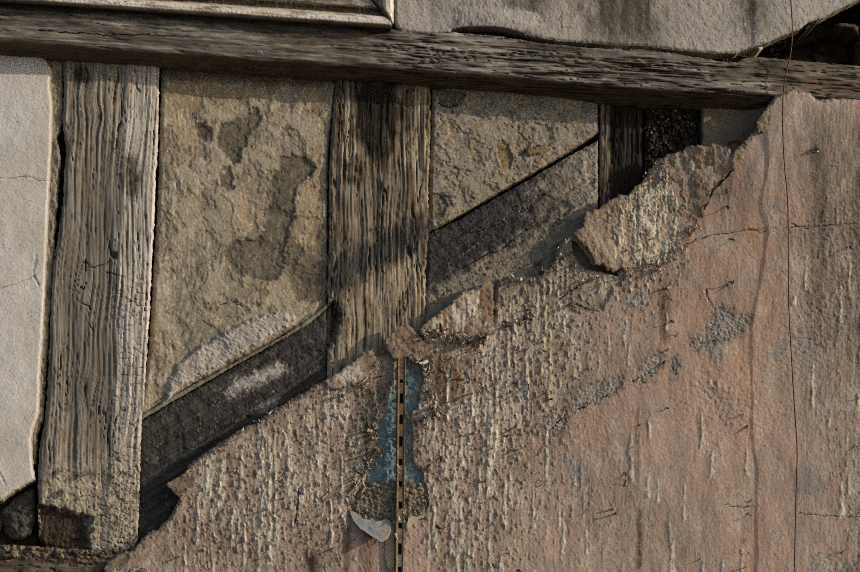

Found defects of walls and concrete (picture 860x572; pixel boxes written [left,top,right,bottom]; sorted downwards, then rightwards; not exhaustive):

crack [703,170,732,214]
crack [679,228,766,249]
peeling [321,323,492,571]